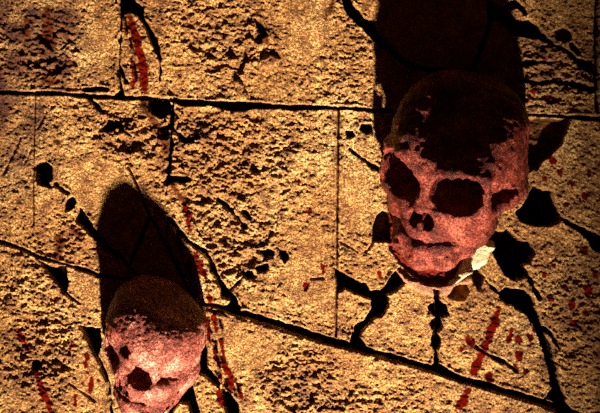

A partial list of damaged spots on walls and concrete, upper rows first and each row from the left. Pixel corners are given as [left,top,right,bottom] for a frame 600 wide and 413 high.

crack [119,0,162,70]
crack [342,0,442,73]
crack [466,0,600,121]
crack [0,62,393,186]
crack [31,166,39,225]
crack [0,183,193,300]
crack [167,184,579,413]
crack [560,218,600,252]